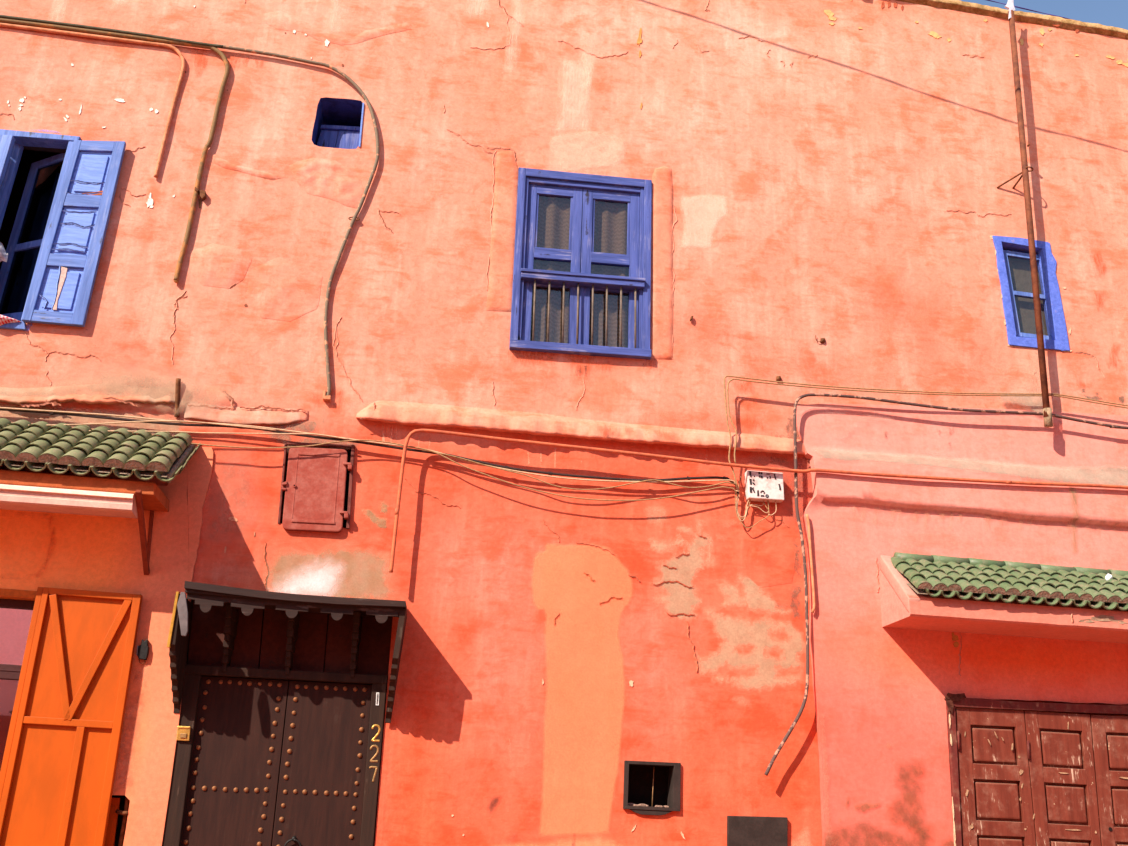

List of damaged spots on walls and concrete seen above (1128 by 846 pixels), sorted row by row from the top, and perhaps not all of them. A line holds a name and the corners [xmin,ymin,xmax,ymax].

crack [470,0,523,50]
crack [39,180,146,310]
crack [169,291,188,364]
crack [20,333,101,408]
crack [543,519,706,672]
peeling [650,522,805,691]
leakage [792,761,954,846]